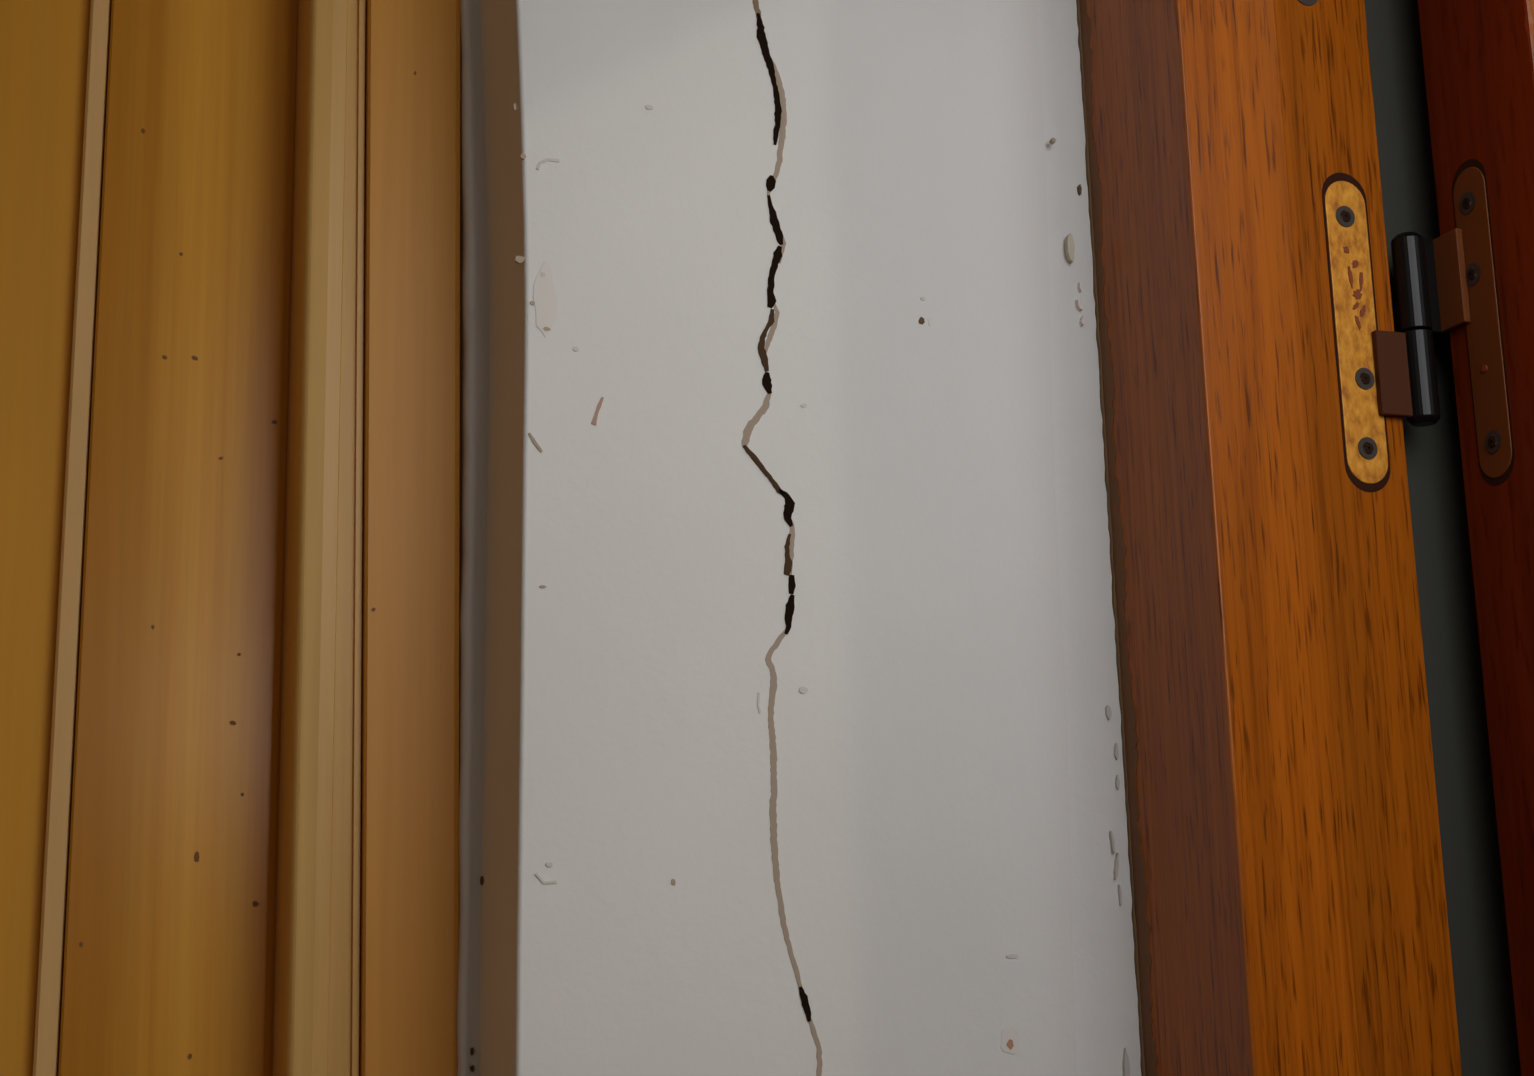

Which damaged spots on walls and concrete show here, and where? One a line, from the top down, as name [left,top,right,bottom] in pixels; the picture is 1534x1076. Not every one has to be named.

crack [741,0,823,1076]